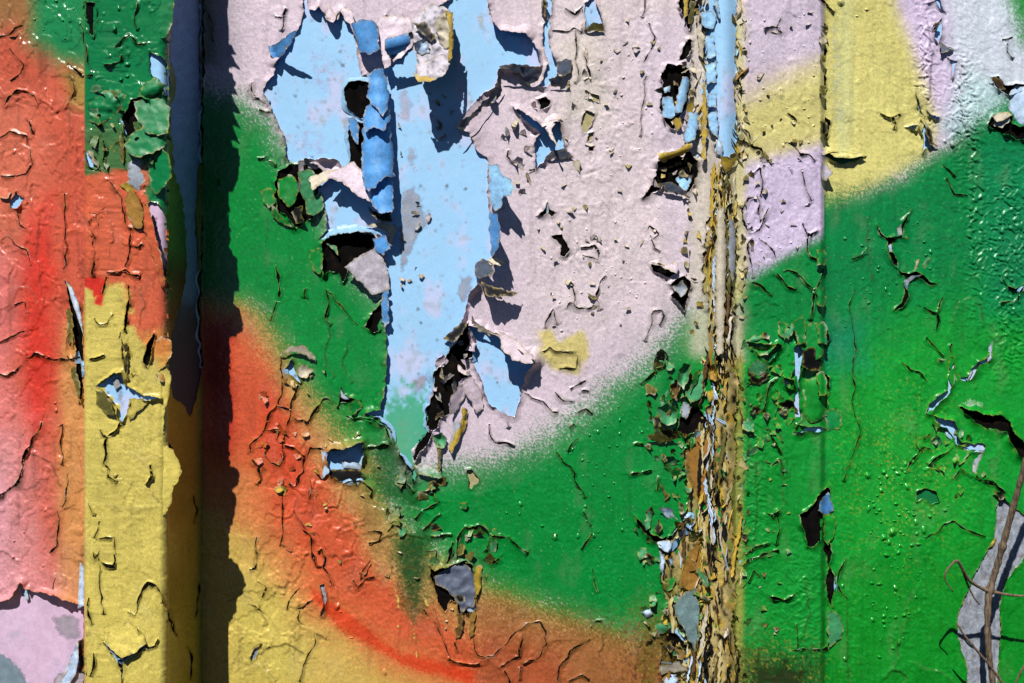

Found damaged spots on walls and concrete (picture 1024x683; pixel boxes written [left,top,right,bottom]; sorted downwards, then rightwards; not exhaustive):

crack [0,23,41,182]
crack [0,118,146,380]
crack [0,419,203,683]
peeling [58,0,204,515]
crack [245,242,608,683]
peeling [254,0,617,500]
peeling [414,528,498,639]
crack [632,512,694,576]
peeling [633,0,798,683]
crack [850,205,1024,497]
peeling [951,485,1024,683]
peeling [992,112,1012,128]